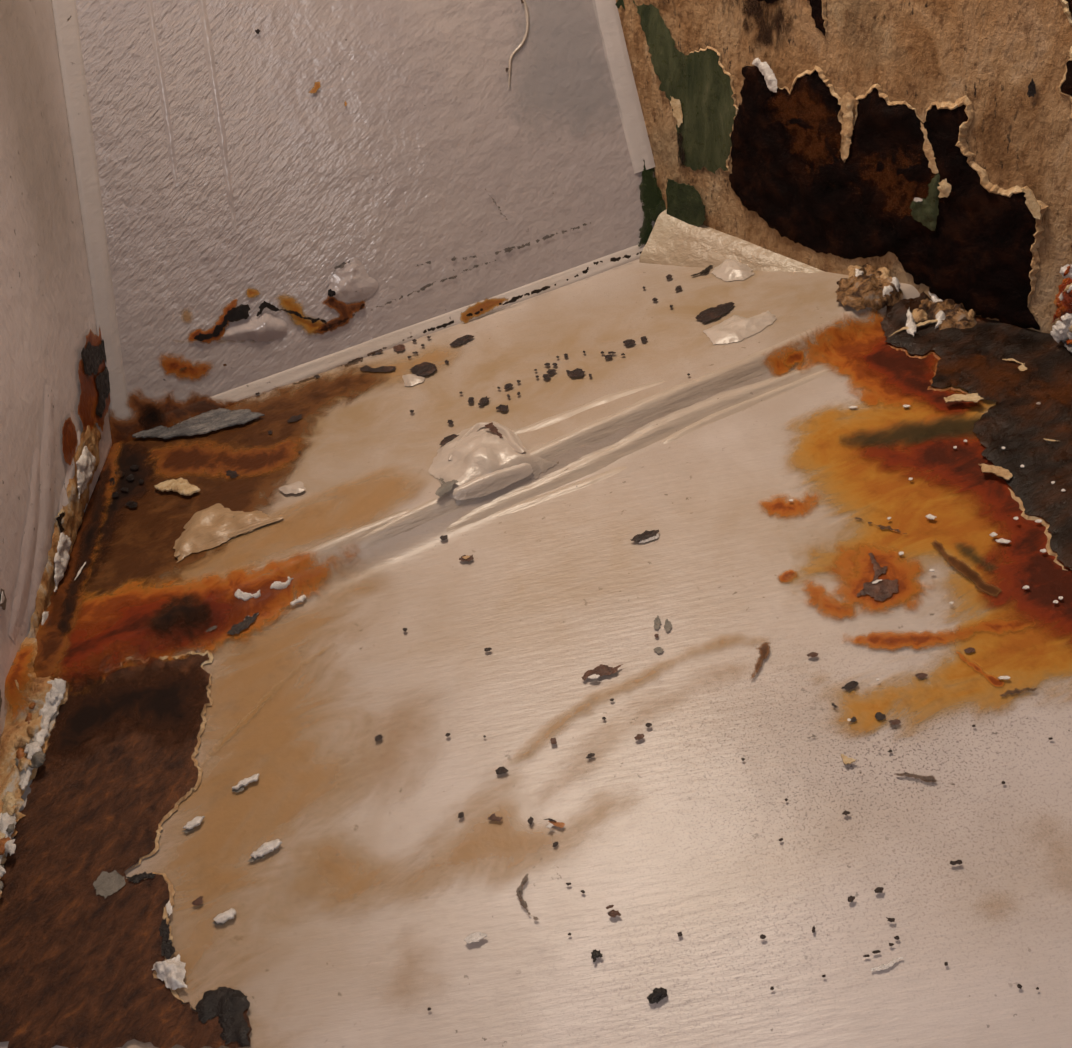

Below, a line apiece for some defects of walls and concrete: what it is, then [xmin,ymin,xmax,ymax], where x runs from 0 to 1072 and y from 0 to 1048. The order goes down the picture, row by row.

spalling [0,424,259,1048]
rust [33,328,453,1010]
rust [522,666,659,756]
peeling [695,302,735,322]
rust [751,642,770,678]
spalling [729,0,1072,571]
rust [761,309,1072,734]